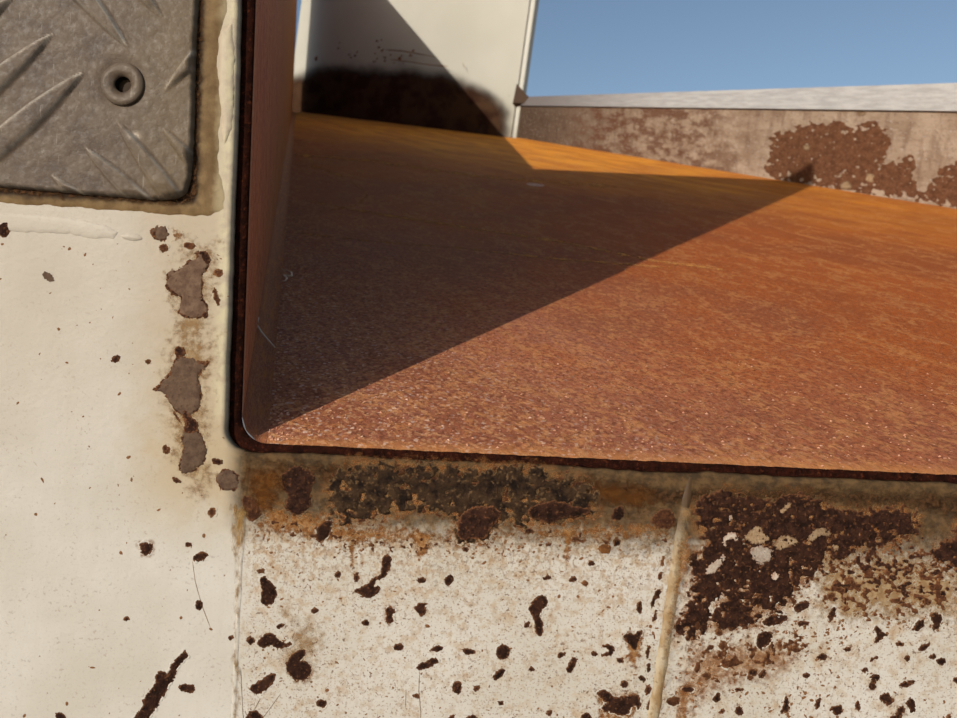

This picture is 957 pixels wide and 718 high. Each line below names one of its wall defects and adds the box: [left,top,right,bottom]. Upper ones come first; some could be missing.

rust [763,111,957,209]
peeling [150,225,170,254]
peeling [165,241,223,319]
peeling [152,346,240,492]